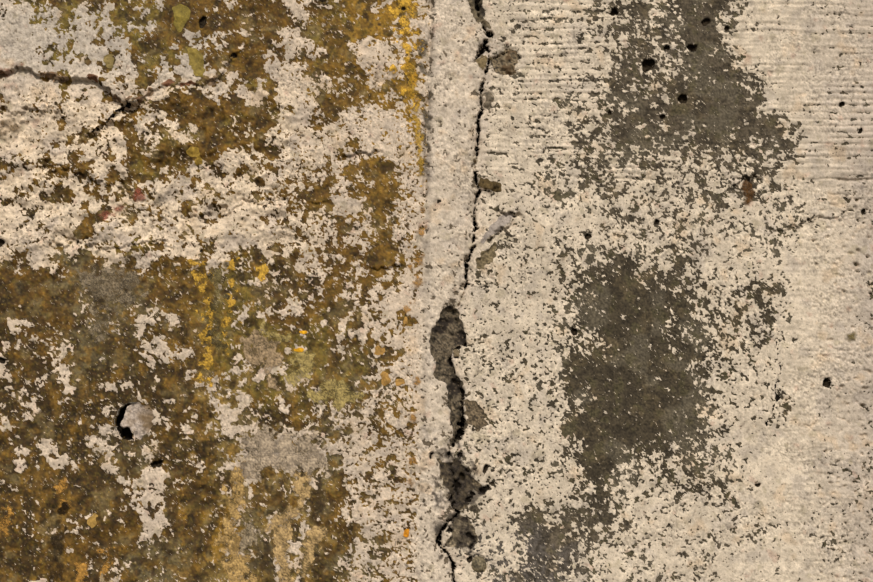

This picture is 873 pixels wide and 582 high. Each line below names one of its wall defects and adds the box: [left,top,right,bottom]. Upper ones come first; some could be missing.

crack [91,100,138,132]
water stain [388,0,430,186]
crack [464,0,507,290]
water stain [256,263,269,282]
water stain [187,257,242,387]
water stain [240,318,365,412]
crack [447,422,465,458]
water stain [48,477,69,581]
water stain [74,562,88,582]
water stain [97,547,119,582]
water stain [213,422,333,582]
crack [436,494,461,582]